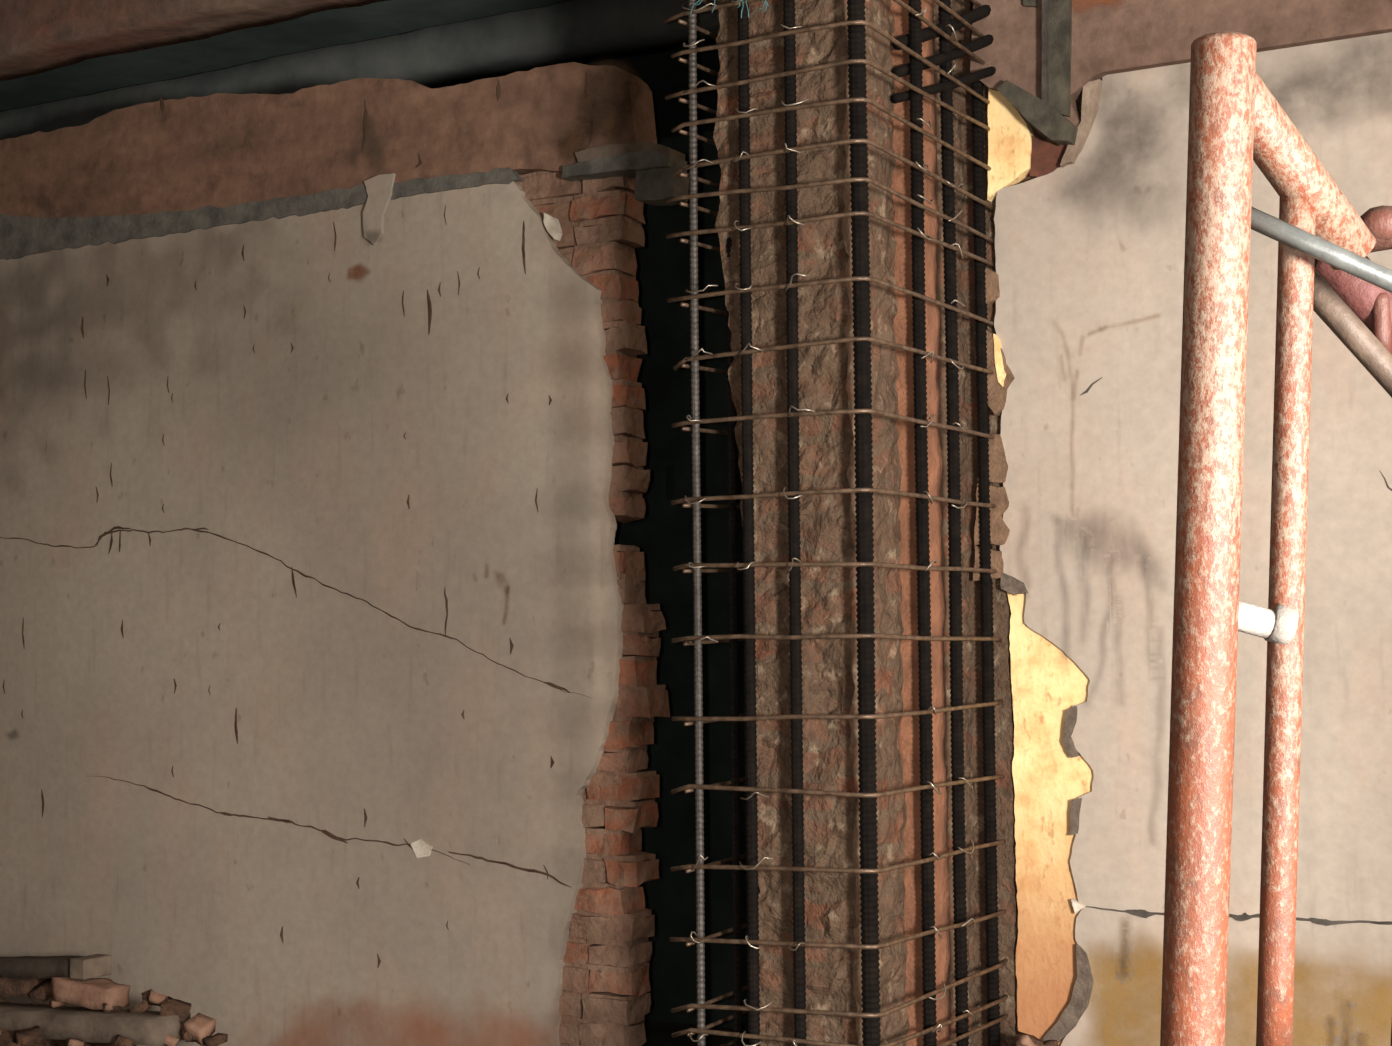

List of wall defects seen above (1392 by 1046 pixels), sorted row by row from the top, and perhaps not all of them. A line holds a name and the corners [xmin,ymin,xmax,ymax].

peeling [987,88,1068,202]
spalling [985,268,1000,309]
spalling [986,330,1015,416]
crack [0,526,590,698]
peeling [973,434,1094,1046]
crack [98,776,570,887]
crack [1086,906,1164,918]
crack [1229,913,1260,921]
crack [1296,917,1392,926]
water stain [1094,948,1163,1046]
water stain [1225,964,1258,1046]
water stain [1292,964,1392,1046]